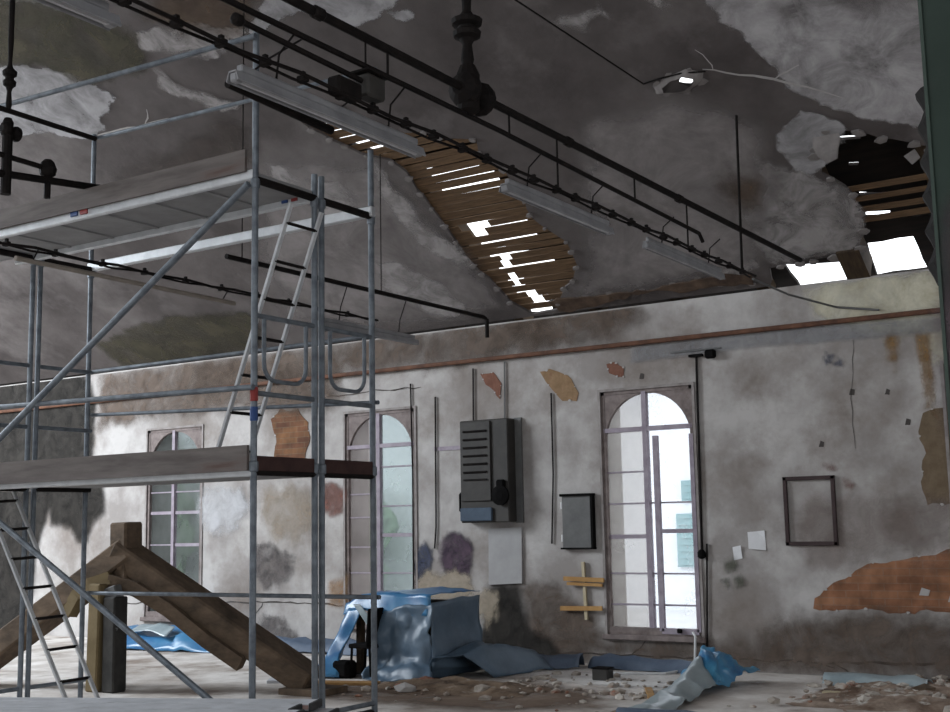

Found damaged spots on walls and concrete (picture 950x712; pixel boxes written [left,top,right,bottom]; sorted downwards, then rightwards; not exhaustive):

peeling [136,0,414,58]
peeling [0,64,116,139]
peeling [548,0,924,312]
peeling [376,160,485,278]
peeling [377,262,465,317]
spalling [540,369,579,401]
spalling [271,409,310,458]
spalling [905,407,950,506]
spalling [813,549,950,614]